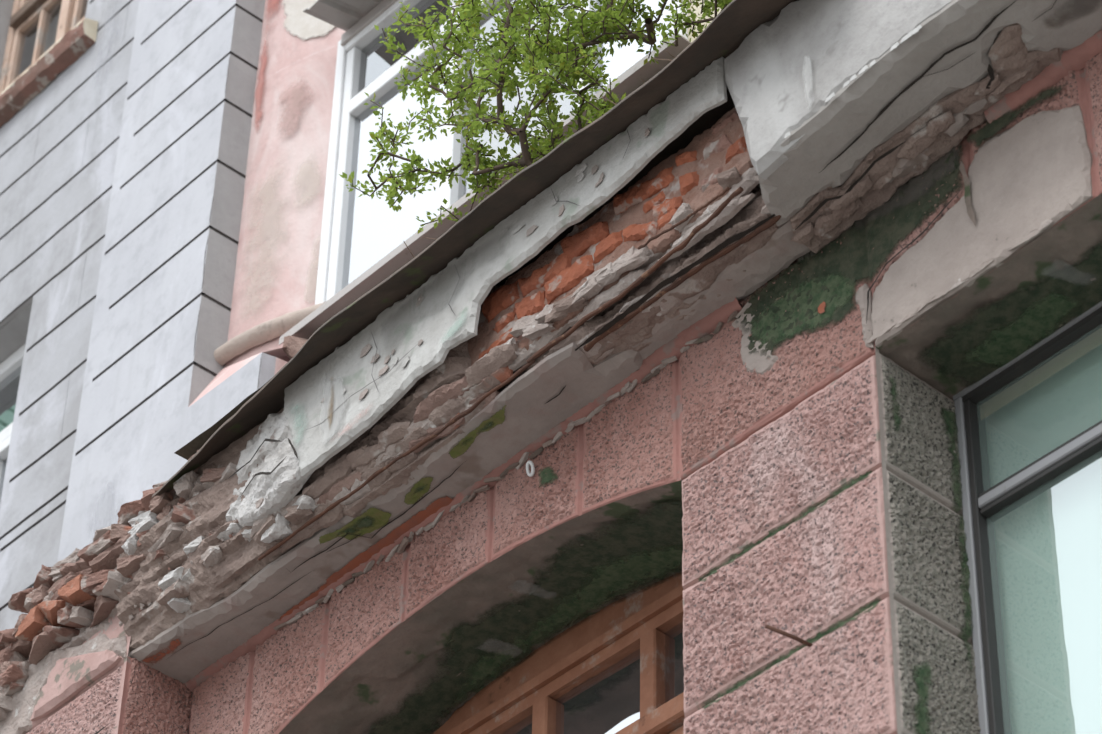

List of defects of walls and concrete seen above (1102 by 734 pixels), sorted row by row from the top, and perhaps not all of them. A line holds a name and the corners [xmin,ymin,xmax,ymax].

peeling [282,0,335,40]
spalling [577,23,1093,375]
crack [819,0,1057,173]
flaking render [0,107,759,734]